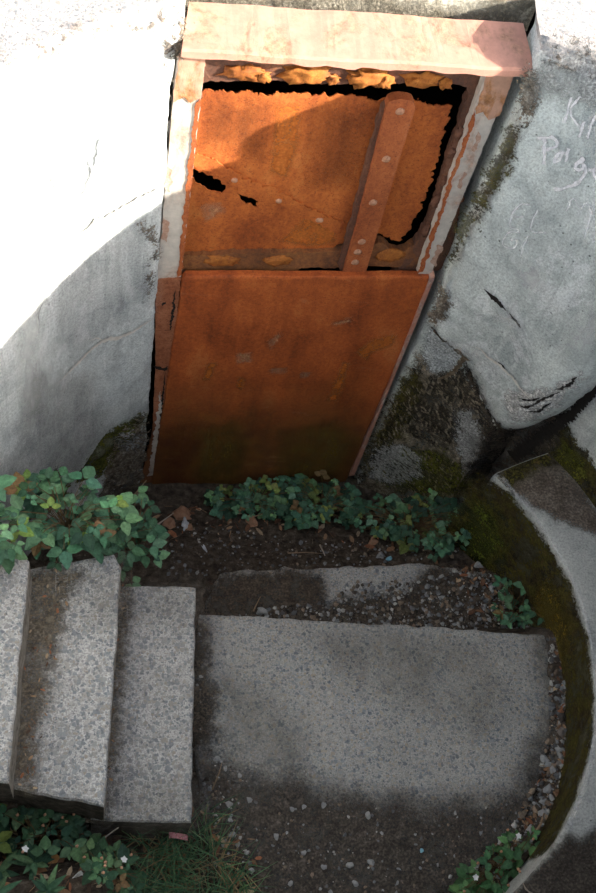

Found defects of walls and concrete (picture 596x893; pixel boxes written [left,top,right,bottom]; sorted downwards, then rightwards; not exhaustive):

corrosion [217,63,453,90]
crack [431,327,532,400]
leakage [369,324,596,536]